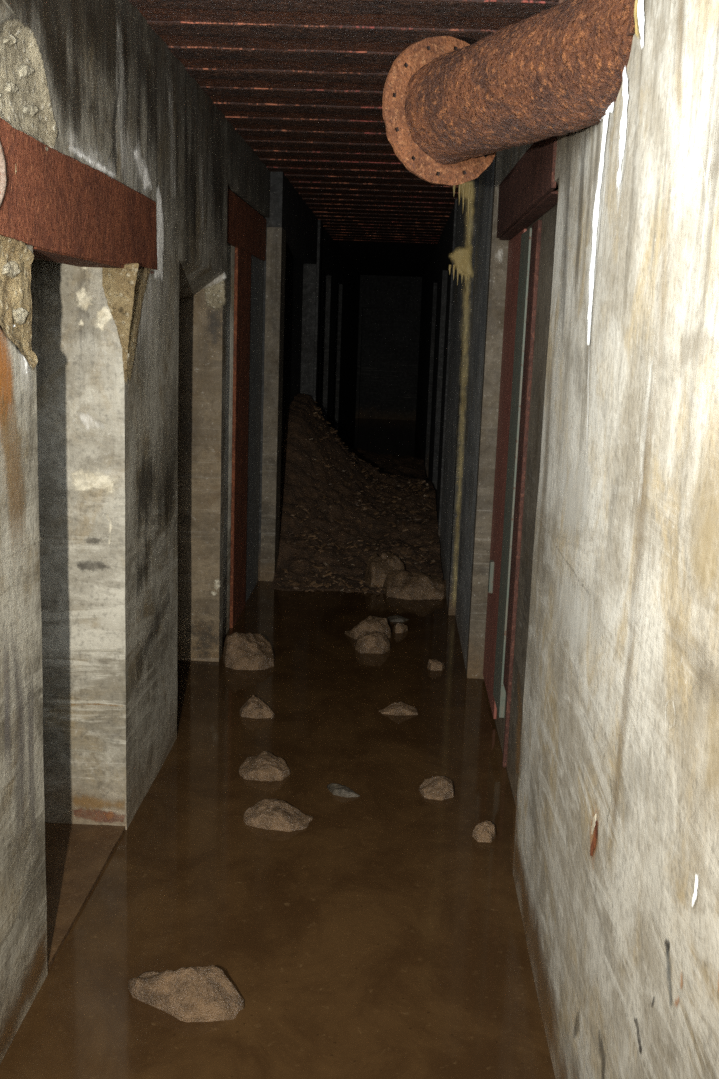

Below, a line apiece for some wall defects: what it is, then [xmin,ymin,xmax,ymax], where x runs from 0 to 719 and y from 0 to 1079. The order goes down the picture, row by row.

spalling [0,19,58,151]
water stain [634,0,644,47]
water stain [587,67,628,345]
rust [0,328,12,411]
spalling [0,235,38,370]
spalling [76,263,150,382]